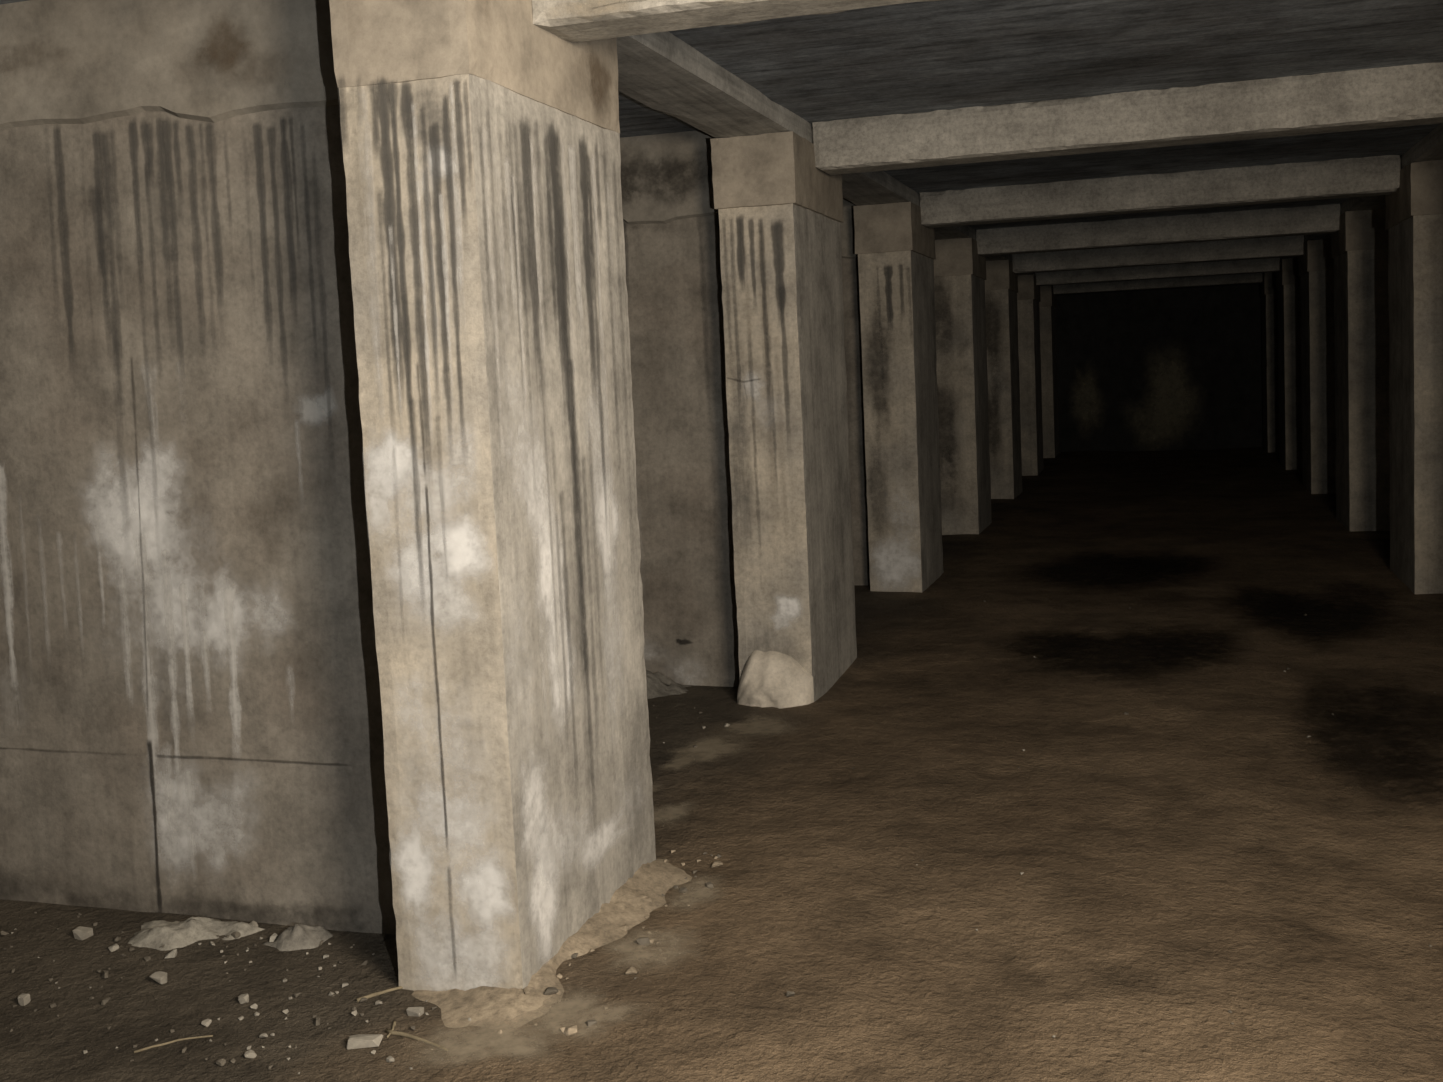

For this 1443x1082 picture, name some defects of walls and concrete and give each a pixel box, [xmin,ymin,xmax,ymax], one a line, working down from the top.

damp [130,121,196,249]
damp [255,120,295,331]
damp [373,81,469,429]
damp [737,218,785,343]
damp [302,392,332,422]
damp [367,433,451,525]
damp [505,125,618,717]
damp [0,467,15,680]
damp [88,451,244,861]
damp [396,517,487,620]
damp [775,597,800,627]